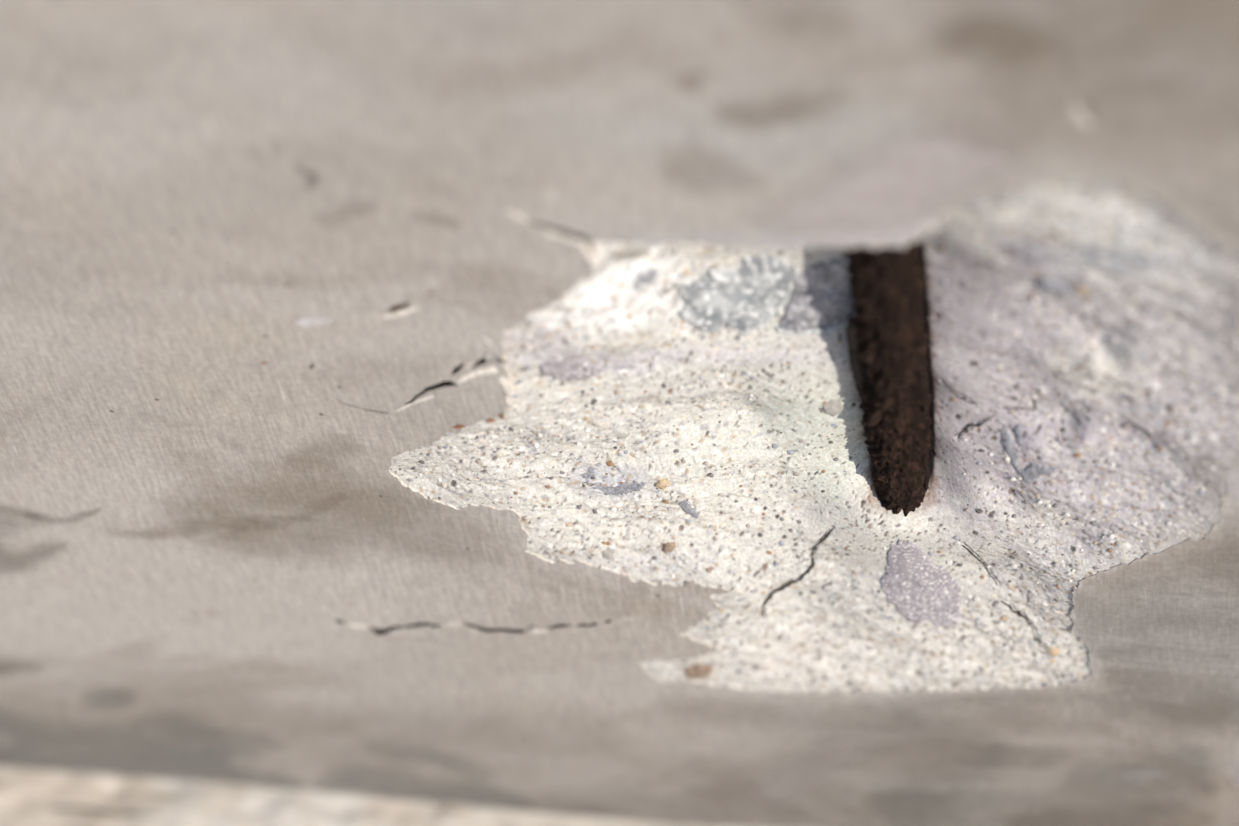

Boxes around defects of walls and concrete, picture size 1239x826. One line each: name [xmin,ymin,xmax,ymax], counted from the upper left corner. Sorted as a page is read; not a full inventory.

crack [394,336,515,413]
spalling [384,176,1239,695]
rust [842,241,933,517]
crack [320,607,612,635]